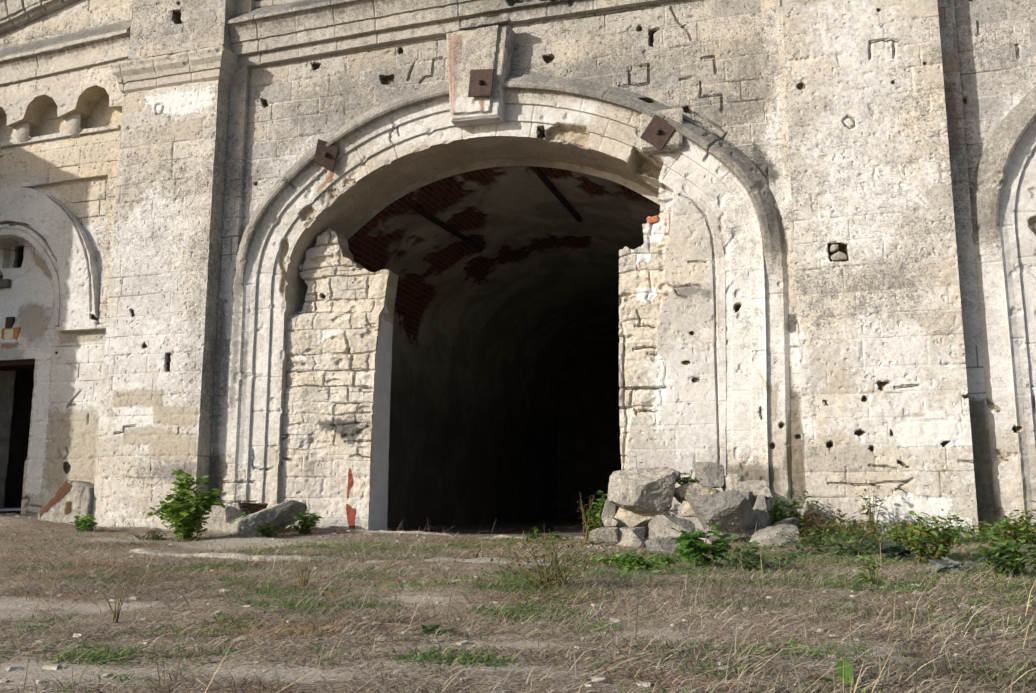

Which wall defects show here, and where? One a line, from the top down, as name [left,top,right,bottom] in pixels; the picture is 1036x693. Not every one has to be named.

water stain [318,418,358,444]
water stain [970,399,995,530]